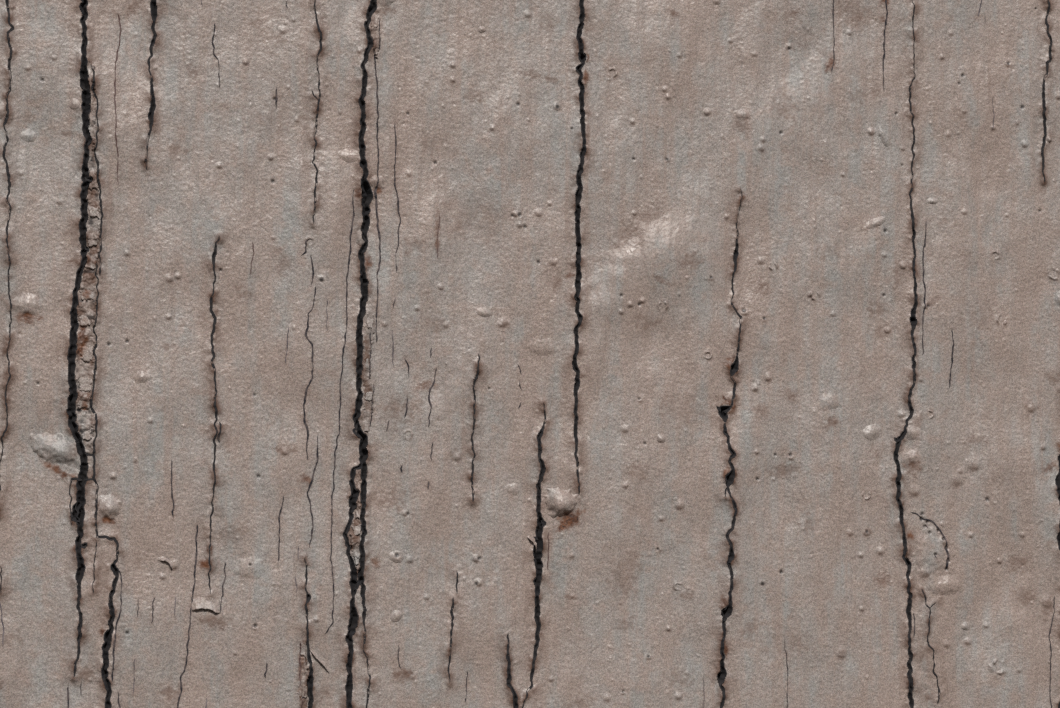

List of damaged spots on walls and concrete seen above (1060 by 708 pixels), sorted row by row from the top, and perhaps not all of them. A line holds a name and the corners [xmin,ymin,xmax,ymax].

crack [66,0,226,708]
crack [278,0,437,708]
crack [506,365,549,708]
crack [572,0,587,497]
crack [703,191,743,708]
crack [883,0,950,708]
crack [1041,0,1053,182]
crack [1049,595,1060,708]
crack [1052,454,1060,550]